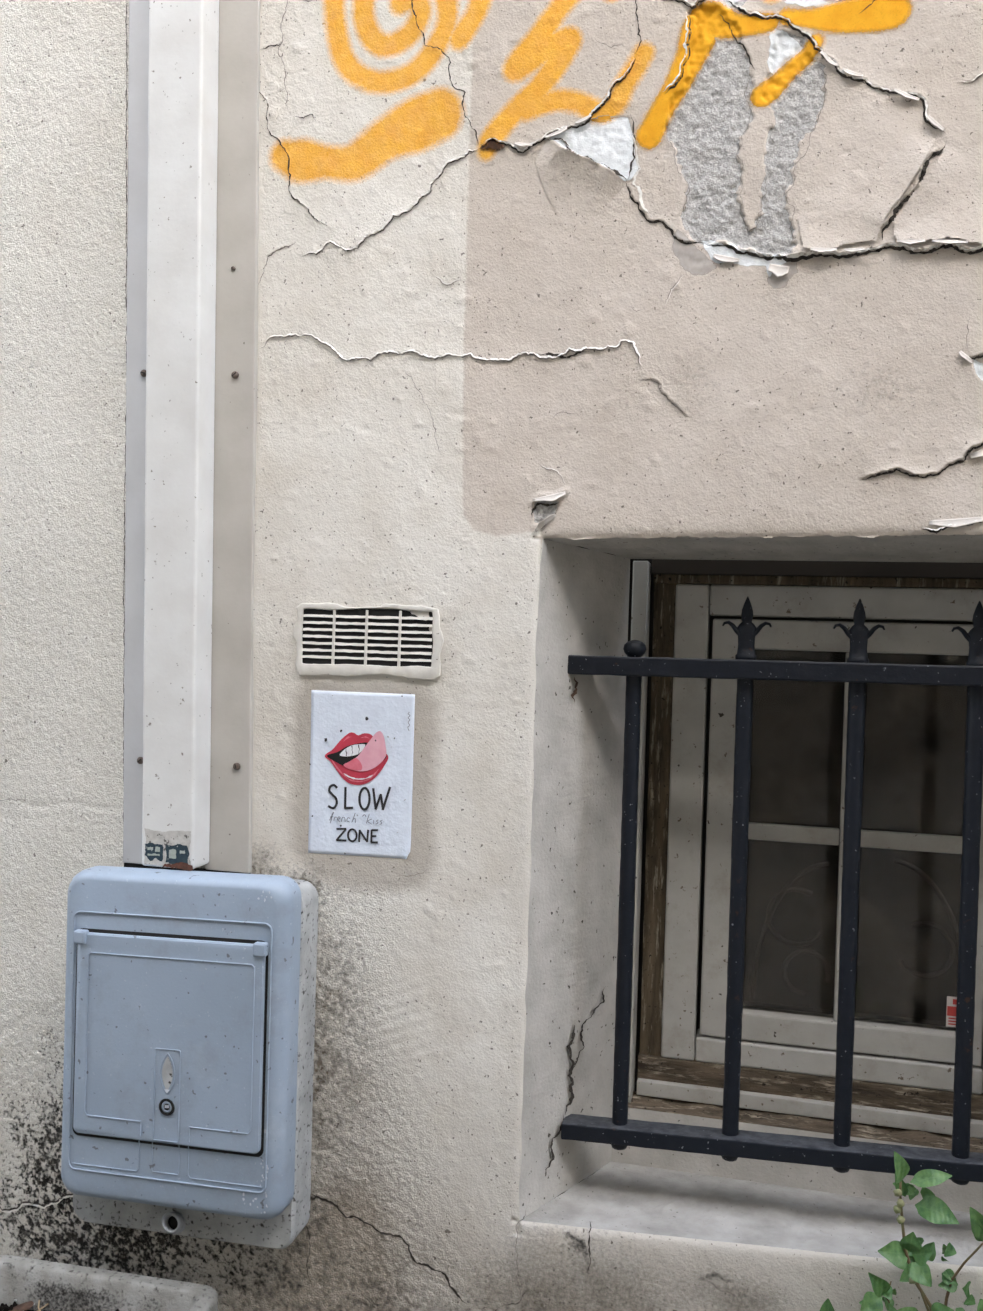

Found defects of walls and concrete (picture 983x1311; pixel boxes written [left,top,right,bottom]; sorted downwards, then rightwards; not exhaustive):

peeling [784,0,846,8]
peeling [550,117,652,217]
crack [259,0,983,283]
spalling [661,0,827,289]
crack [262,275,689,456]
peeling [959,318,983,381]
peeling [863,443,983,480]
crack [923,517,983,533]
crack [545,989,605,1170]
leakage [0,1062,300,1296]
crack [306,1193,526,1311]